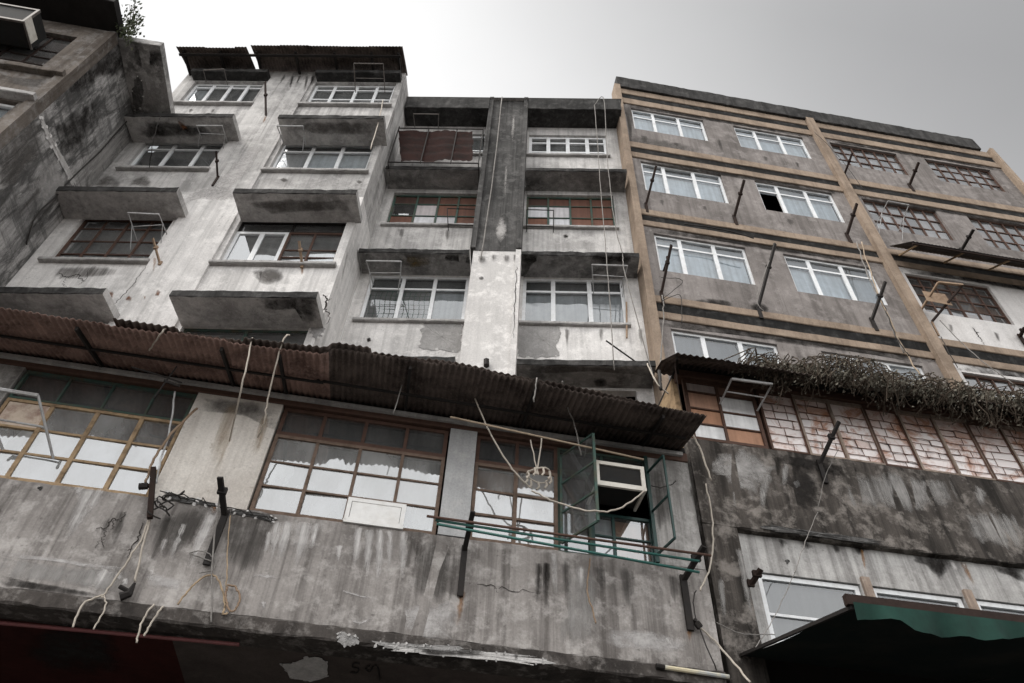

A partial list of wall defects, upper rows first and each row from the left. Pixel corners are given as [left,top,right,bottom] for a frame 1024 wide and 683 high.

leakage [71,44,123,91]
leakage [57,104,95,151]
leakage [59,267,107,278]
leakage [775,457,845,508]
crack [95,512,143,561]
leakage [158,508,217,558]
leakage [227,522,318,564]
leakage [337,528,406,568]
leakage [917,557,965,575]
leakage [406,551,452,636]
peeling [280,656,329,682]
spalling [372,641,555,665]